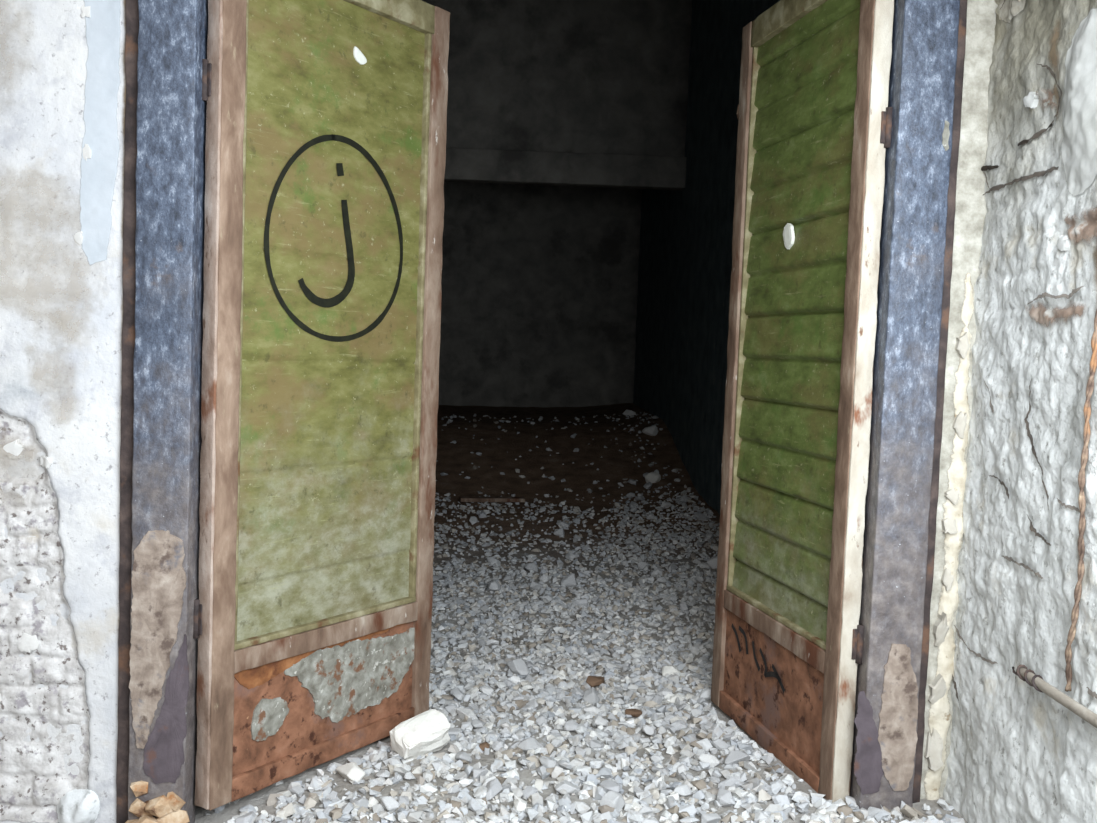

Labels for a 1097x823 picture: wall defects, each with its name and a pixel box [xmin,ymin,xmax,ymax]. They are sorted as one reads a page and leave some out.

spalling [994,0,1026,23]
peeling [73,0,121,265]
spalling [0,409,90,823]
peeling [129,530,187,749]
peeling [878,273,974,800]
crack [954,625,998,664]
crack [990,475,1009,499]
crack [1002,555,1043,579]
crack [1024,379,1080,546]
crack [1086,687,1097,699]